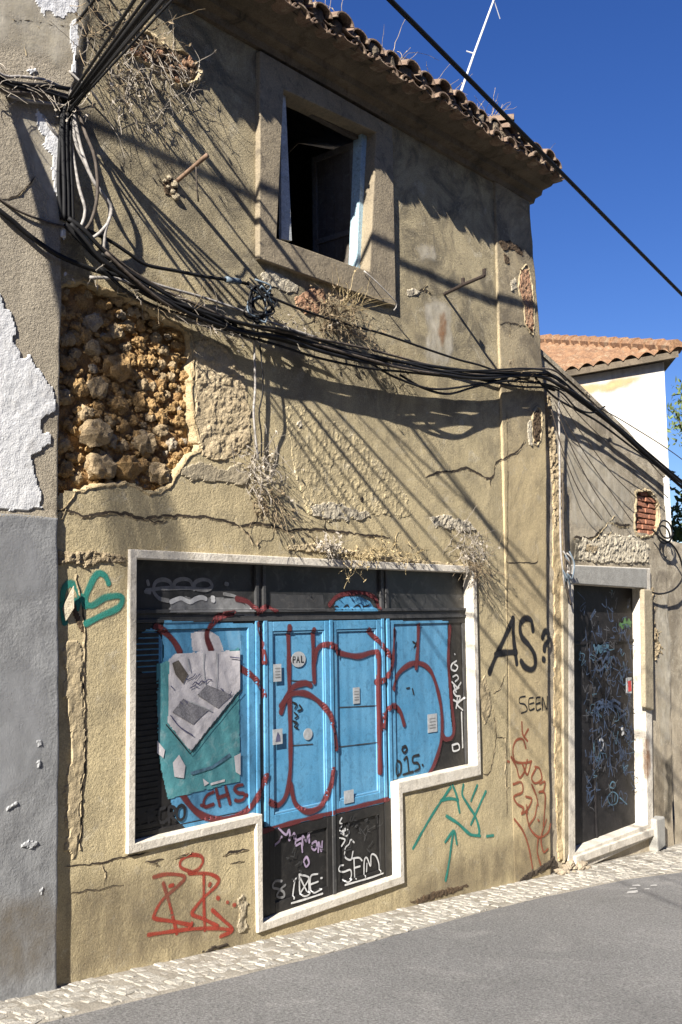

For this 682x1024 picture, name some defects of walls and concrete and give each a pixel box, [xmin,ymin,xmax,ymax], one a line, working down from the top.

peeling [35,109,58,194]
flaking render [295,288,326,315]
flaking render [499,240,535,337]
flaking render [0,277,251,512]
crack [57,508,390,546]
flaking render [633,488,661,539]
crack [425,436,538,789]
crack [65,574,193,894]
crack [223,848,249,865]